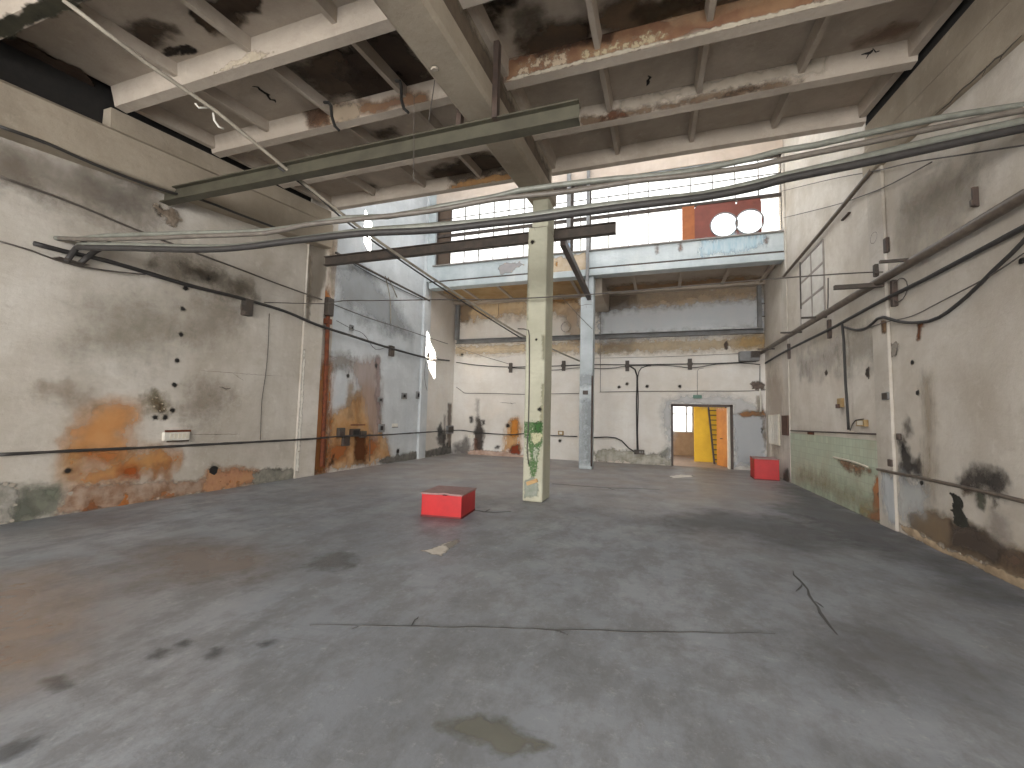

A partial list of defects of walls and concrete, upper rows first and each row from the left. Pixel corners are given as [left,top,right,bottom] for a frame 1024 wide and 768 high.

water stain [126,20,179,48]
water stain [483,0,738,55]
spalling [507,0,844,81]
rust [67,403,181,485]
rust [314,363,390,475]
peeling [0,482,19,524]
flaking render [55,466,294,516]
peeling [949,492,969,528]
water stain [960,467,1008,510]
flaking render [899,523,1024,589]
crack [793,571,838,635]
water stain [438,716,548,755]